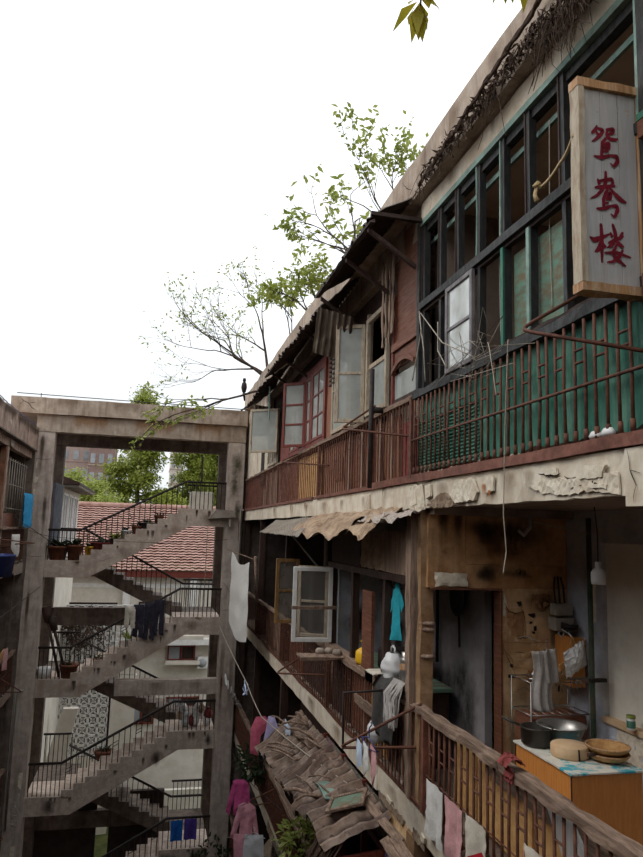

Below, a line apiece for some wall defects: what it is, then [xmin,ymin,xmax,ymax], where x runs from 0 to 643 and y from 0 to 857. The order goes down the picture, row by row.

spalling [528,465,621,496]
peeling [502,592,550,640]